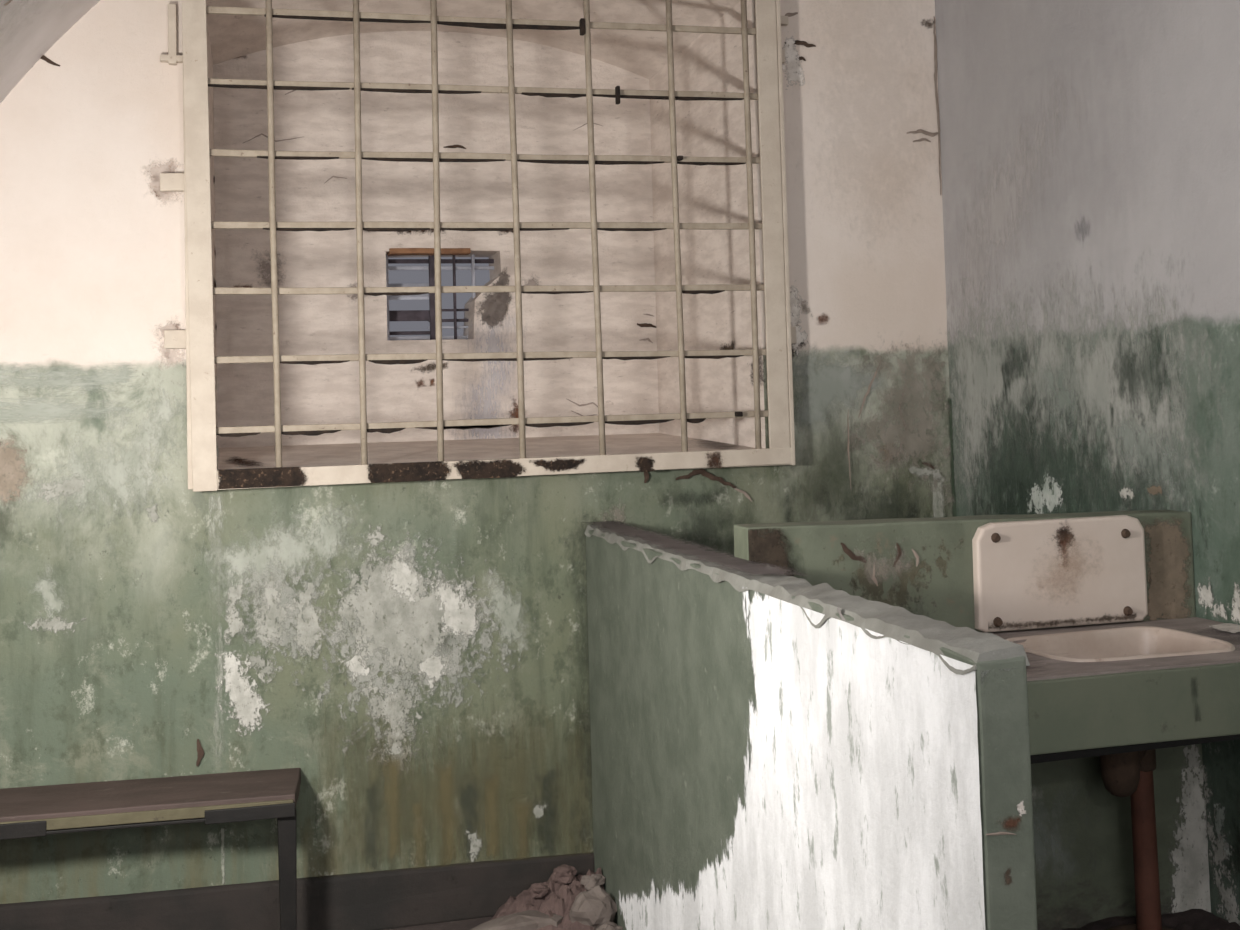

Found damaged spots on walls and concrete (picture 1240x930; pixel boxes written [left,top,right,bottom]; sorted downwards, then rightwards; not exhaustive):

peeling [26,396,182,524]
flaking render [748,528,794,576]
damp [849,488,915,531]
damp [948,398,956,517]
damp [975,398,1159,515]
peeling [206,510,536,790]
peeling [1168,744,1240,925]